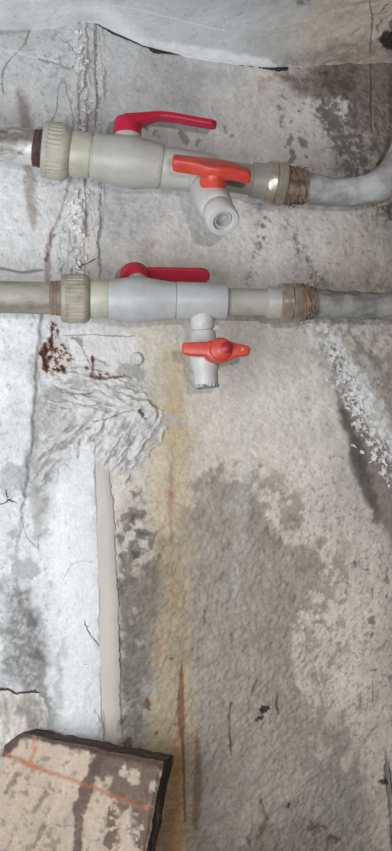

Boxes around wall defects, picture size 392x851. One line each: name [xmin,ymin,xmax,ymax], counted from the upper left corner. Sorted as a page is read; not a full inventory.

peeling [72,21,103,132]
crack [1,23,179,132]
damp [136,0,392,178]
crack [242,64,288,72]
crack [369,0,390,133]
peeling [51,188,100,274]
crack [84,192,101,262]
corrosion [38,319,126,382]
damp [300,318,392,552]
damp [0,473,163,851]
corrosion [2,339,205,851]
damp [190,390,392,851]